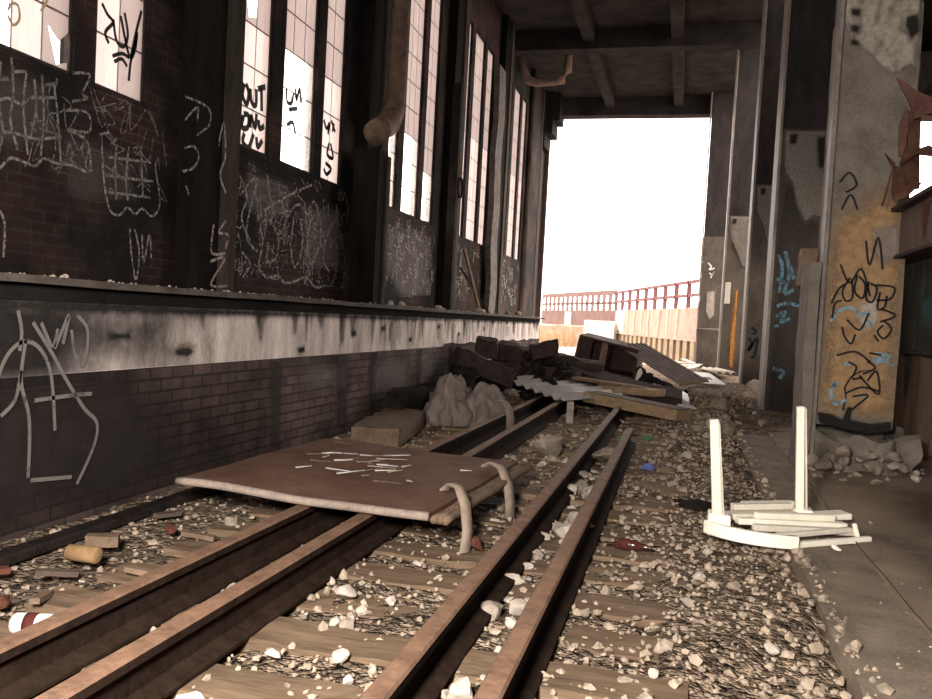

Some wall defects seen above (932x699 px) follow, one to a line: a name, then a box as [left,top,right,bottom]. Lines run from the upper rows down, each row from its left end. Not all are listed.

spalling [846,0,921,74]
water stain [0,299,538,536]